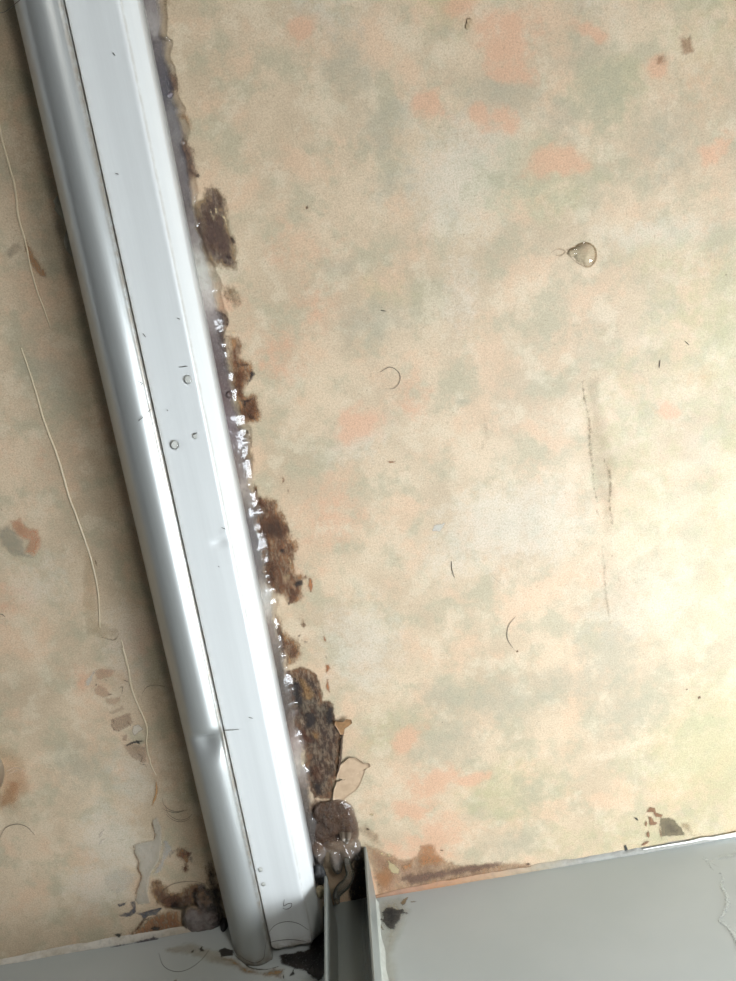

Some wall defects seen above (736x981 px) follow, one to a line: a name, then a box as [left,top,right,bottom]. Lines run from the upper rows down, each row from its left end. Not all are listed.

peeling [333,719,370,800]